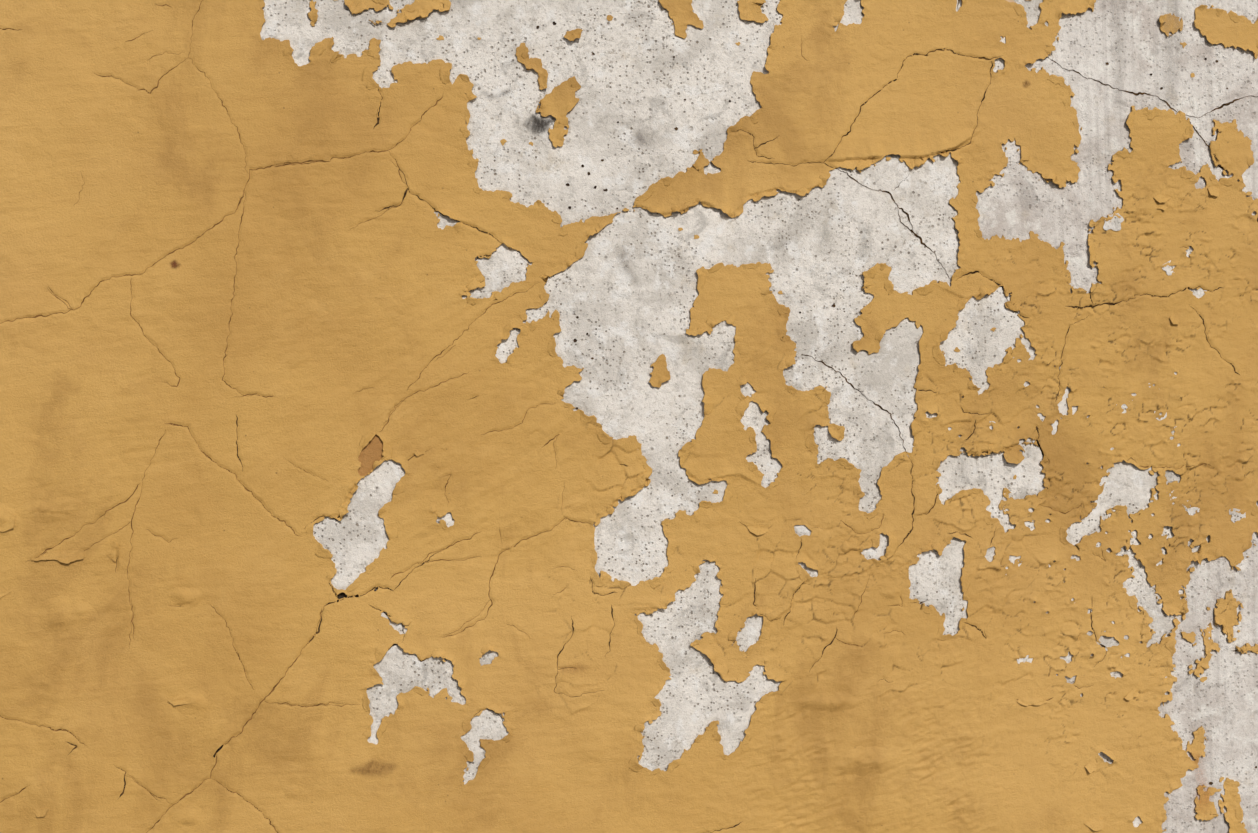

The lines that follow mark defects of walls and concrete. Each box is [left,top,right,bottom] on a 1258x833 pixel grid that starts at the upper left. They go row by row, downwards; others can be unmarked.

crack [735,49,1028,318]
crack [1049,58,1258,177]
crack [2,1,536,652]
peeling [260,0,1258,833]
crack [0,716,85,755]
crack [116,435,591,833]
crack [553,566,618,697]
crack [810,576,928,670]